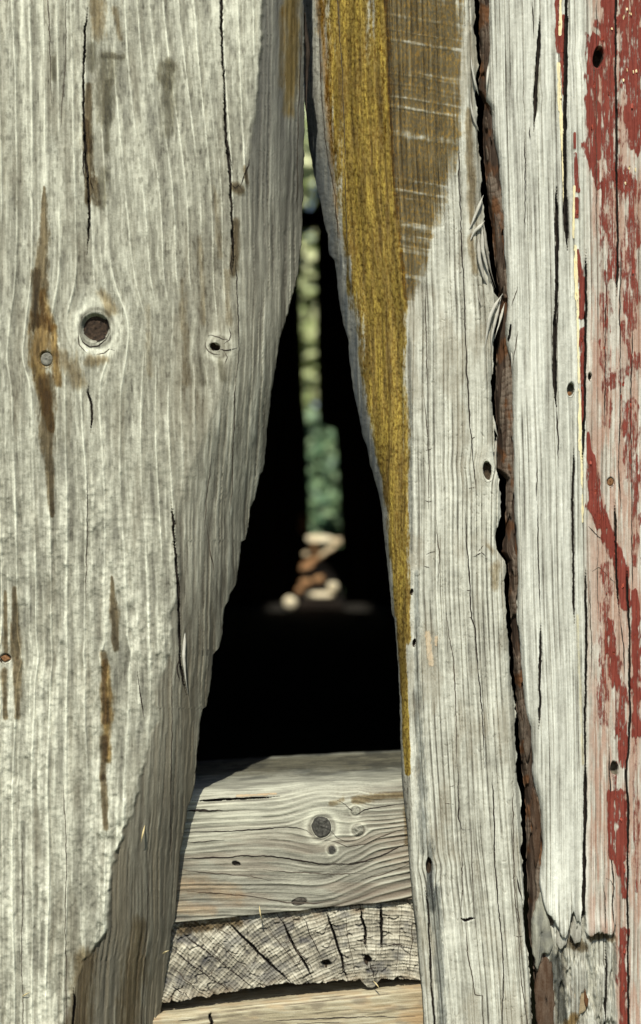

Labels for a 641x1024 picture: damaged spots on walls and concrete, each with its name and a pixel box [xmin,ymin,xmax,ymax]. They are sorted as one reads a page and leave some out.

crack [47,0,93,255]
crack [204,0,250,570]
crack [141,503,435,1024]
crack [445,516,528,1024]
crack [508,287,518,360]
crack [524,0,633,1024]
peeling [579,990,589,1015]
peeling [554,0,641,899]
peeling [615,927,630,1024]